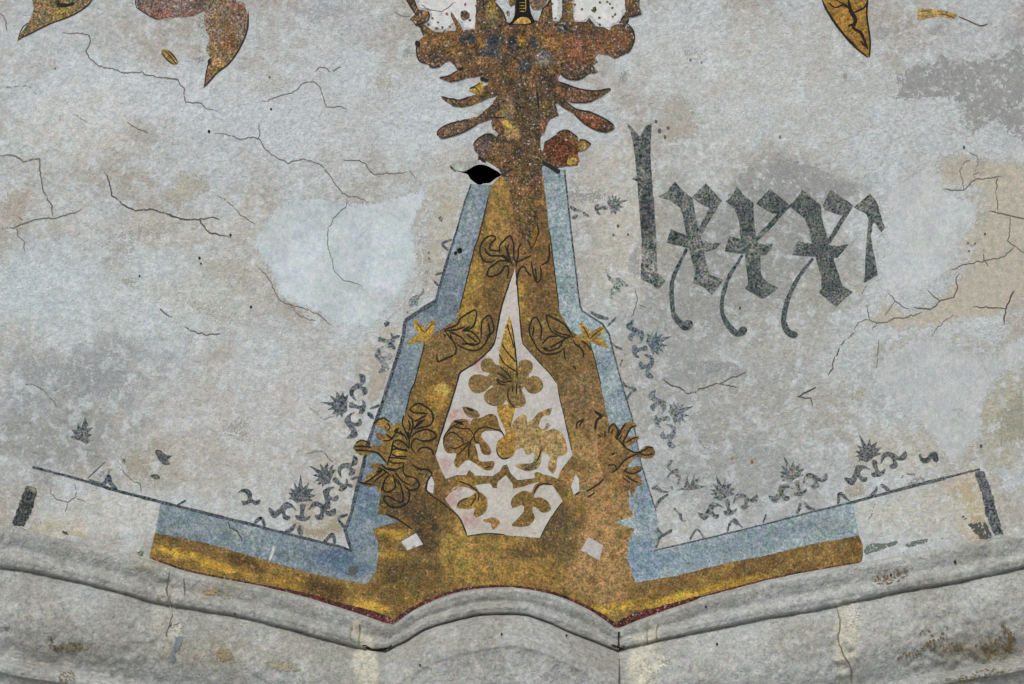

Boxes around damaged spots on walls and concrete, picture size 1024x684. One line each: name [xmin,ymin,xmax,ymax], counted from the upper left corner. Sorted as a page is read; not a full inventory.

crack [0,154,82,251]
crack [160,309,220,336]
crack [62,32,415,287]
crack [255,264,331,325]
flaking render [360,160,512,344]
crack [797,153,1024,406]